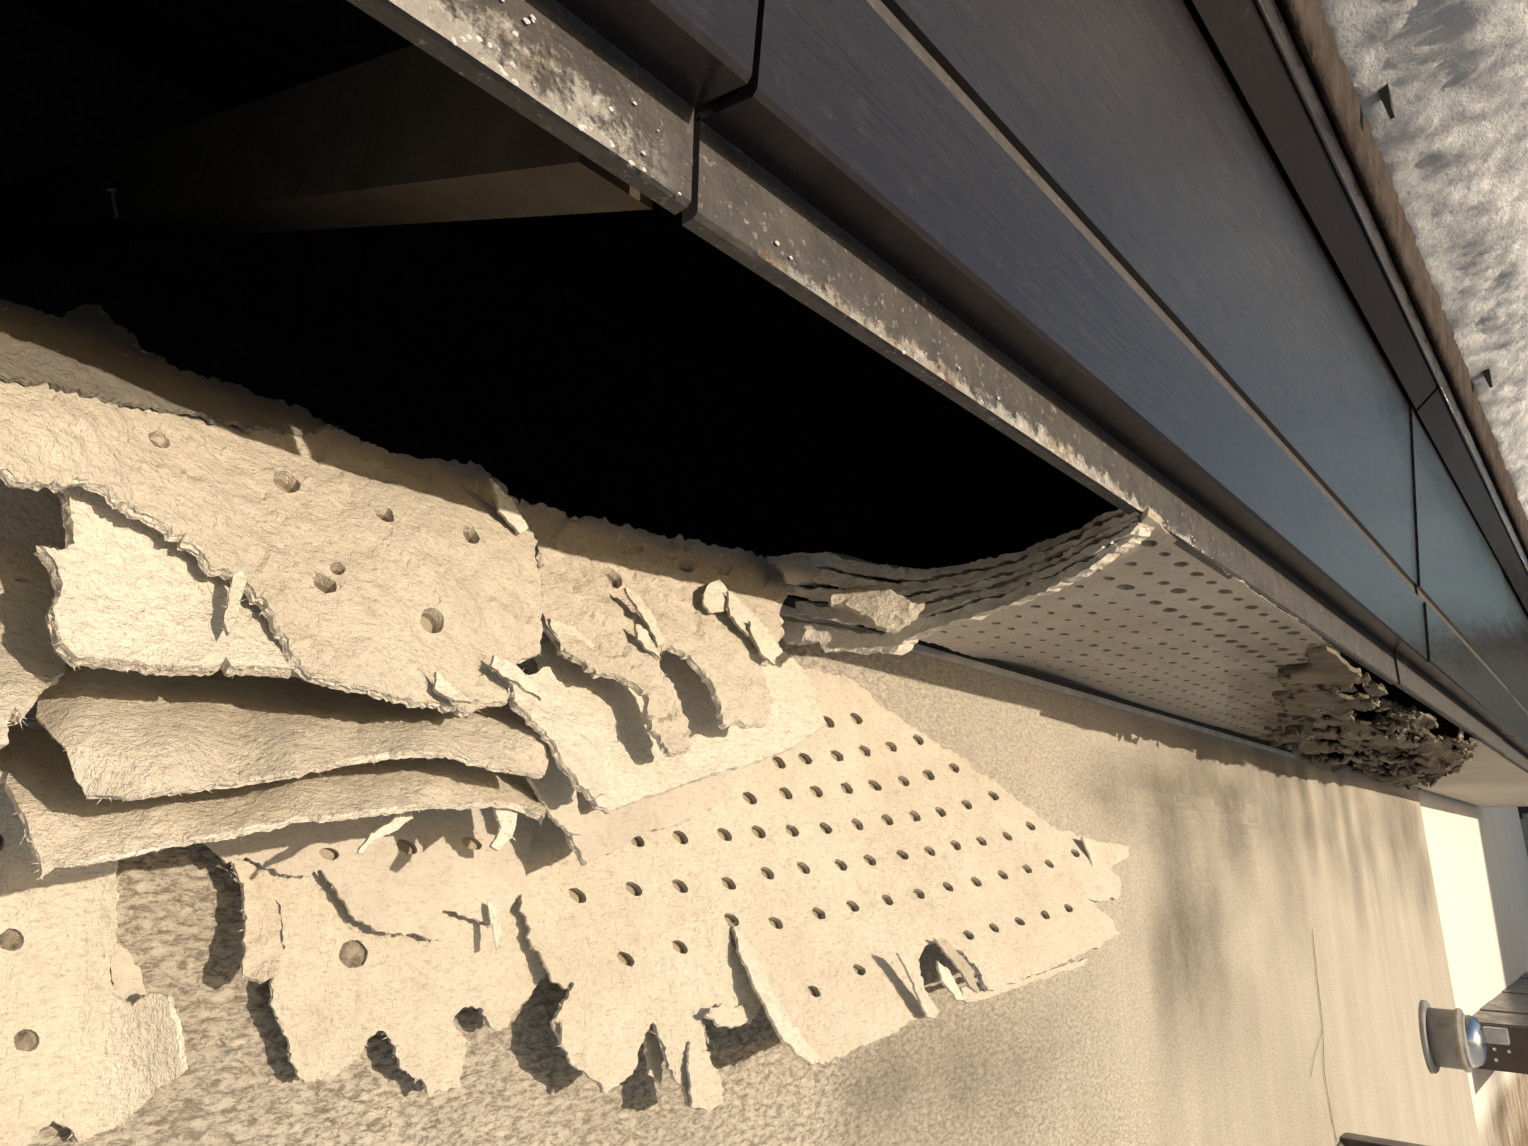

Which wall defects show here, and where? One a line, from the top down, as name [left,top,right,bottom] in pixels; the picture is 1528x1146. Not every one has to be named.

water stain [389,0,659,178]
water stain [771,241,1147,513]
peeling [701,579,783,666]
peeling [489,655,610,836]
peeling [489,807,518,851]
peeling [0,782,188,1146]
peeling [230,860,283,984]
peeling [487,893,577,989]
peeling [559,1021,614,1094]
peeling [686,1041,725,1111]
peeling [704,999,759,1029]
peeling [896,939,1088,1018]